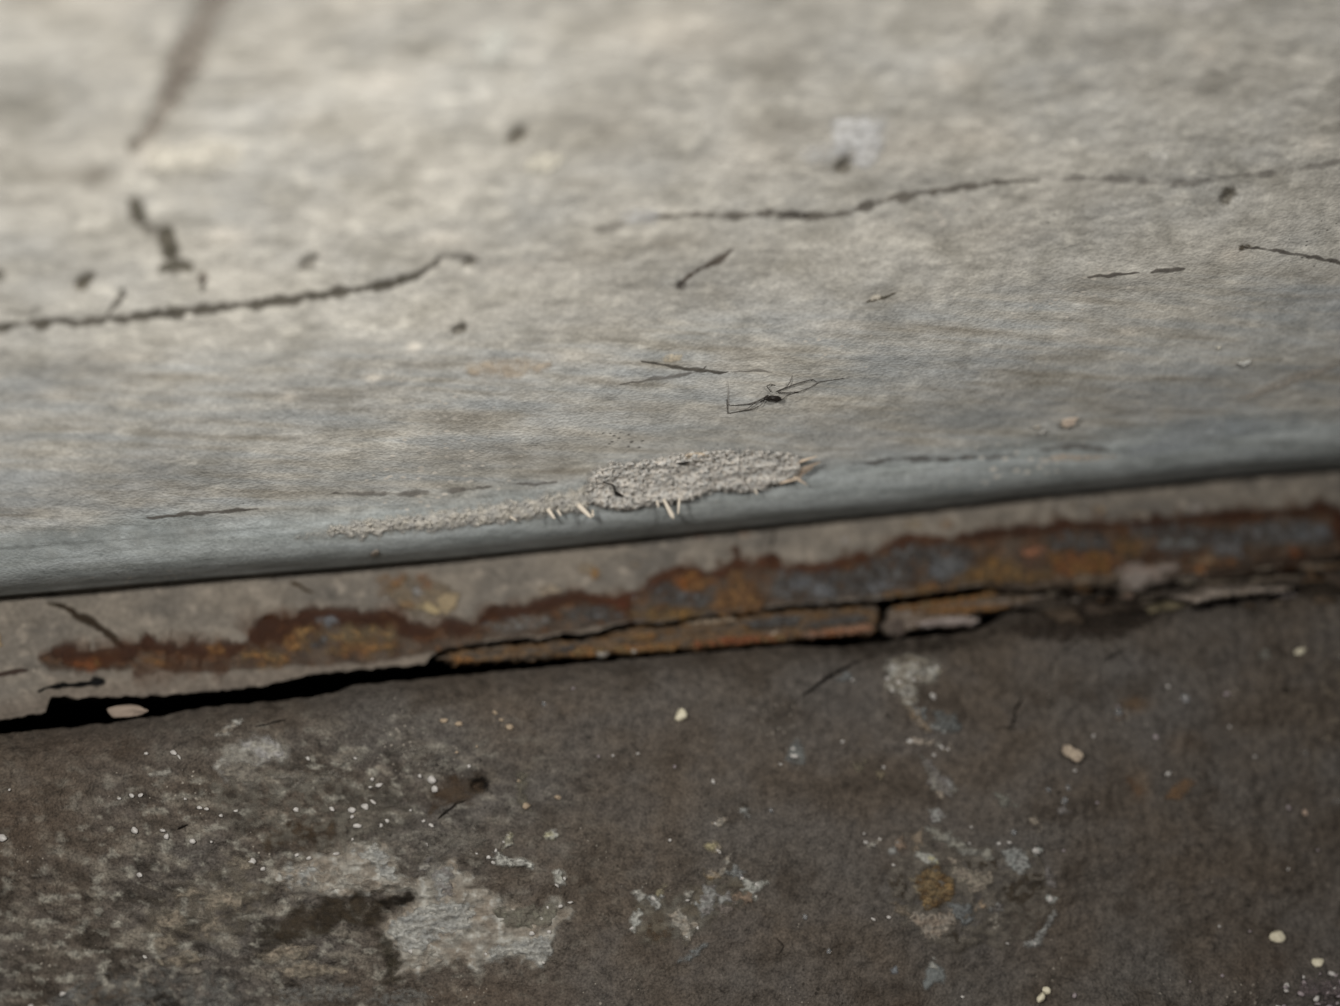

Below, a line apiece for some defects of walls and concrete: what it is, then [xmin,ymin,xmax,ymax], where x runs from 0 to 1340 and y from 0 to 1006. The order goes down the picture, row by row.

crack [0,259,440,332]
rust [40,501,1340,674]
crack [969,584,1007,616]
crack [1117,585,1340,615]
crack [54,603,122,647]
crack [0,669,105,693]
crack [795,656,868,704]
water stain [50,720,573,1006]